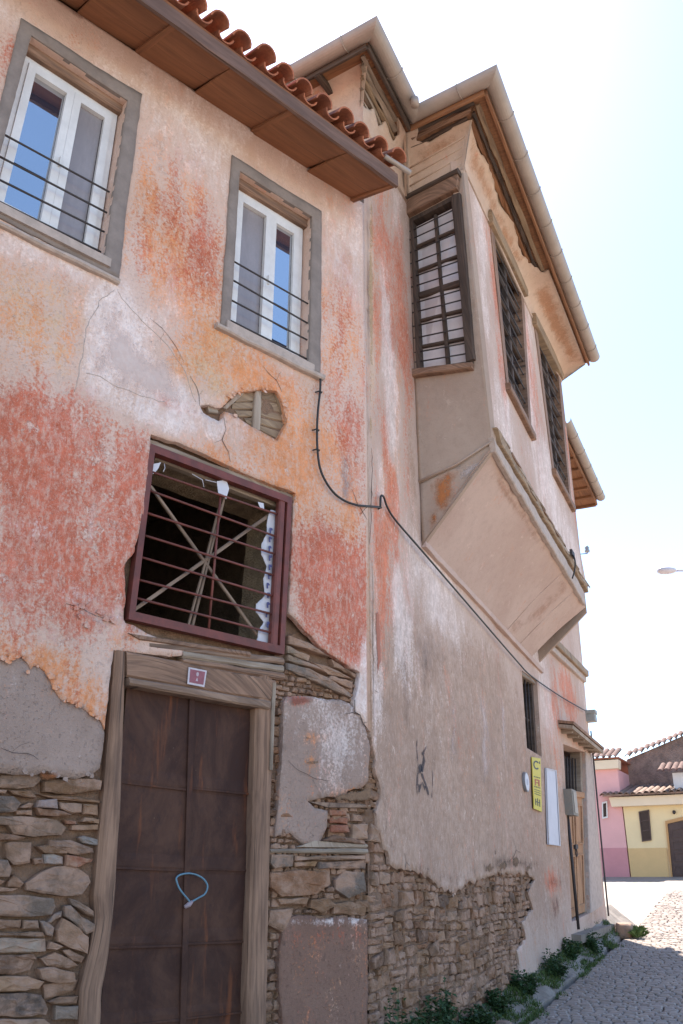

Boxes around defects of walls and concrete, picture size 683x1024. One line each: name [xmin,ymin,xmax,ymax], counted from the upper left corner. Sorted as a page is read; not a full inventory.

peeling [0,653,104,782]